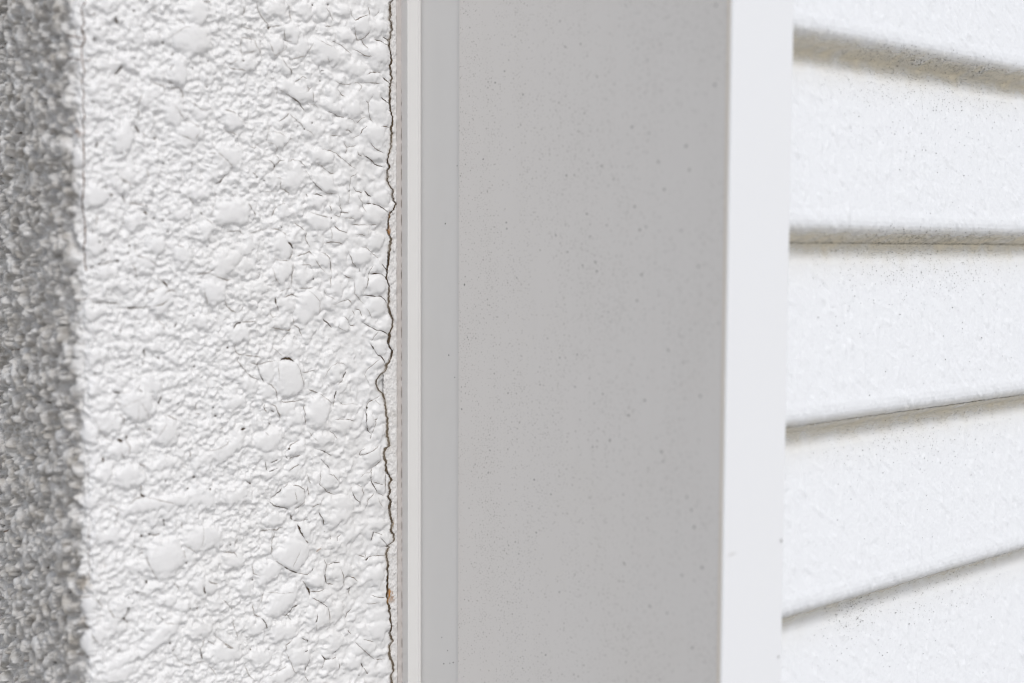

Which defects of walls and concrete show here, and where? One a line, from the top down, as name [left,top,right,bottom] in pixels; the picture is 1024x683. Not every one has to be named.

crack [66,0,396,683]